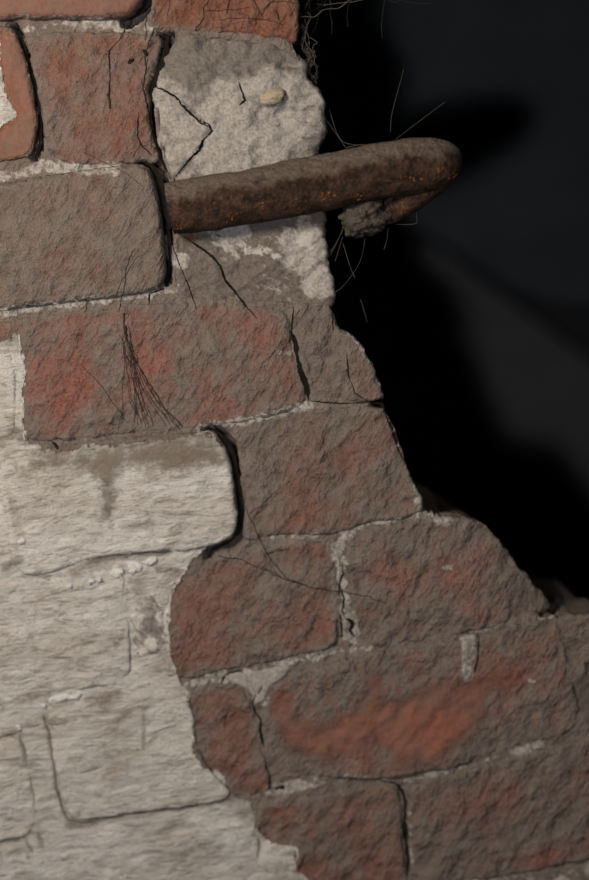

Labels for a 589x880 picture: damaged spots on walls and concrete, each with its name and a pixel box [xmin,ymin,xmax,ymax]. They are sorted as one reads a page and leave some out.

peeling [0,0,141,17]
peeling [0,37,35,160]
crack [137,37,257,319]
corrosion [164,137,462,240]
peeling [18,335,27,440]
crack [291,309,405,463]
peeling [165,565,188,681]
crack [338,564,355,638]
peeling [254,827,308,880]
crack [382,781,410,877]